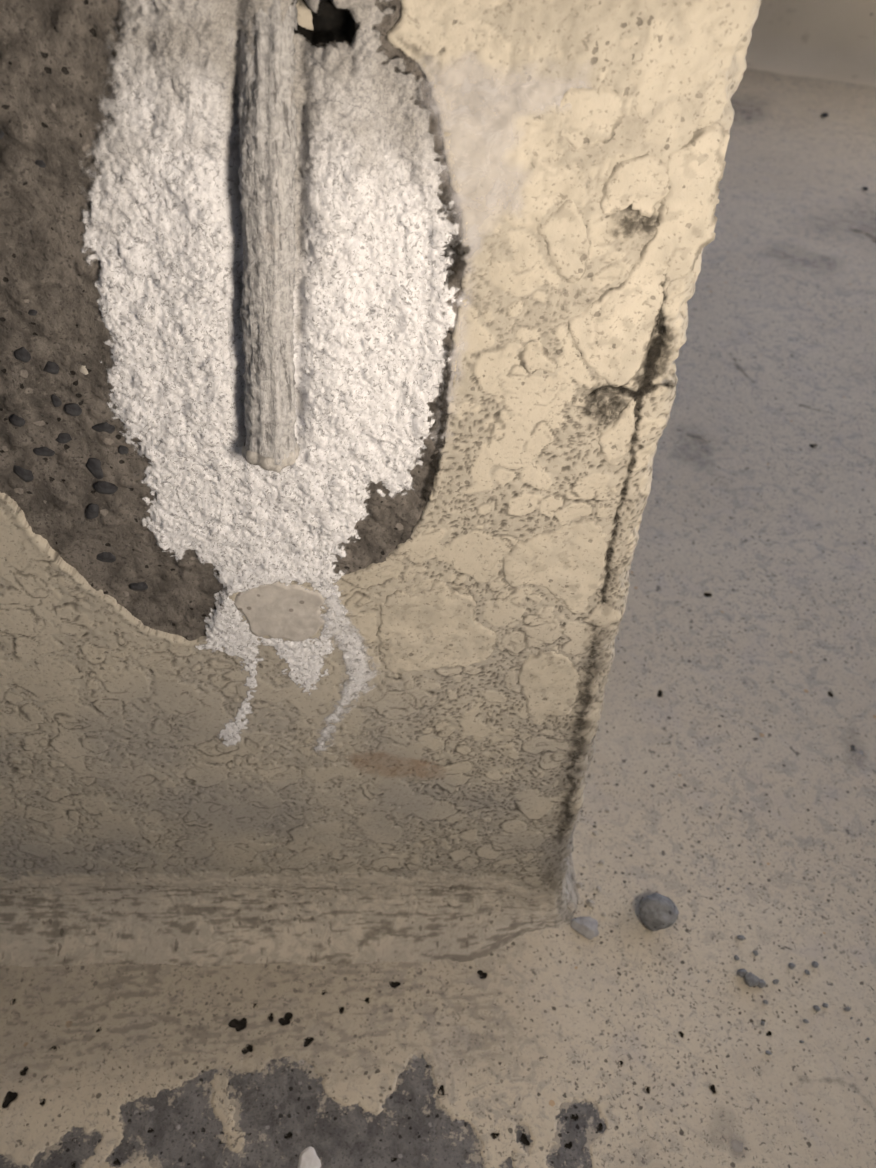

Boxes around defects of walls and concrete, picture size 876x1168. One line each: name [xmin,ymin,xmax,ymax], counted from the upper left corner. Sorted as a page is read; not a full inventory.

spalling [0,0,326,641]
water stain [82,0,504,751]
spalling [305,0,467,575]
crack [590,274,676,603]
spalling [228,1003,257,1032]
peeling [0,1037,533,1168]
spalling [267,1012,293,1026]
peeling [546,1099,607,1168]